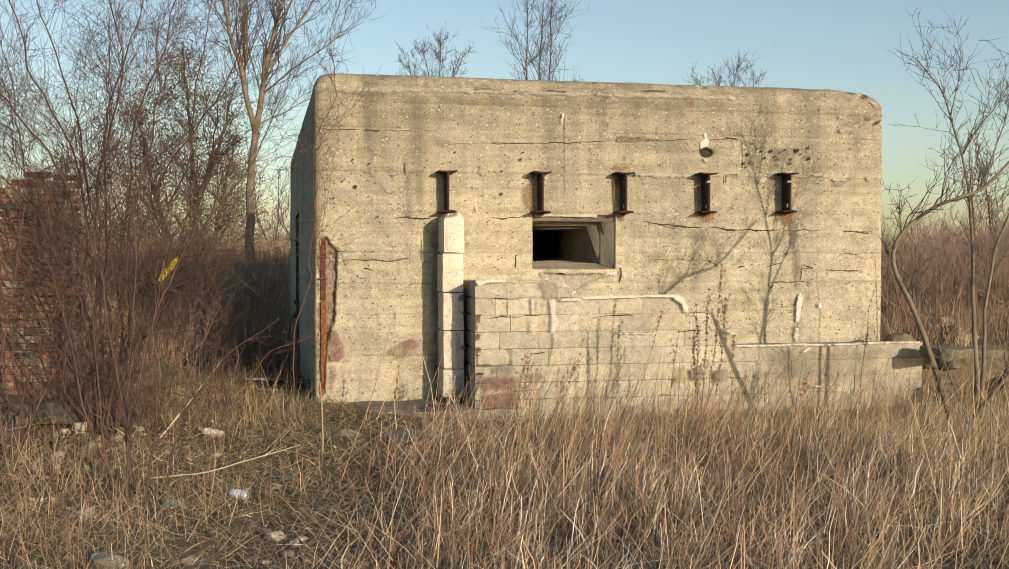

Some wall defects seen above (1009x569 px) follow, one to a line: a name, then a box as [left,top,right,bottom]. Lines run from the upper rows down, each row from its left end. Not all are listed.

rust [525,176,545,215]
rust [614,165,628,221]
crack [644,221,819,232]
spalling [318,237,344,391]